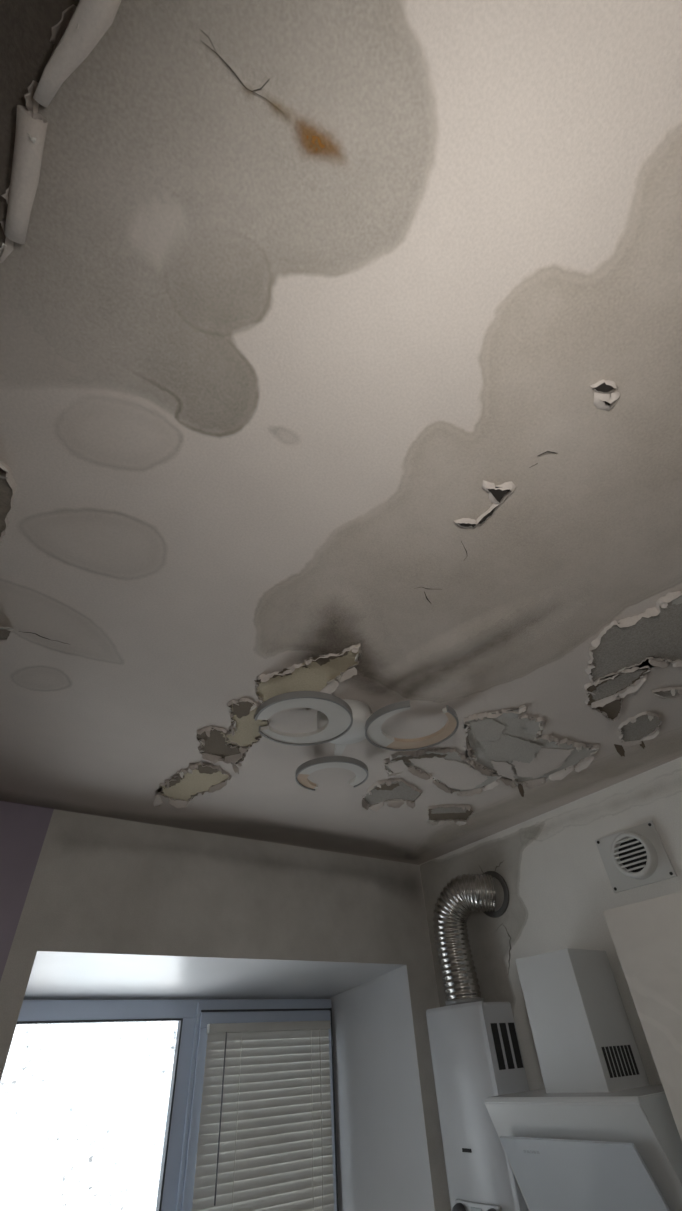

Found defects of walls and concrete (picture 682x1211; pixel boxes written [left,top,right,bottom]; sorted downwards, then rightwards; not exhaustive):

peeling [49,4,77,44]
crack [201,30,284,114]
rust [301,123,338,154]
peeling [0,460,17,544]
peeling [153,643,362,809]
peeling [362,591,682,826]